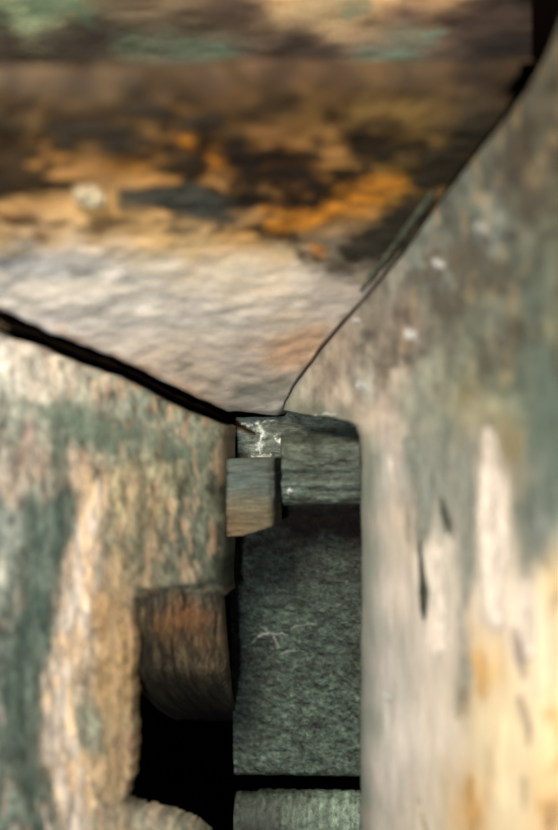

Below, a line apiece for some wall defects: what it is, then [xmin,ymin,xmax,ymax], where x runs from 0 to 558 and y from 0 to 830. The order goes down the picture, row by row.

water stain [46,115,156,160]
water stain [117,101,352,231]
corrosion [264,177,404,232]
water stain [247,109,502,275]